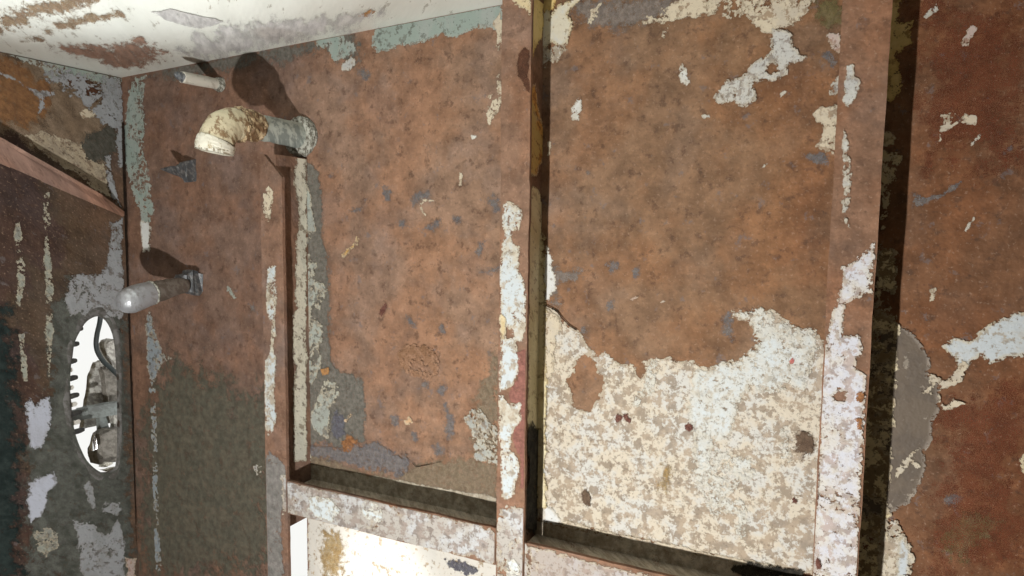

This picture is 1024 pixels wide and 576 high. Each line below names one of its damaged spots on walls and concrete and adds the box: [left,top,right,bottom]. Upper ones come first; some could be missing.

rust [20,8,173,70]
peeling [316,35,356,61]
peeling [371,0,579,68]
peeling [638,0,815,107]
rust [891,0,1024,190]
peeling [264,265,278,435]
peeling [279,83,1024,576]
peeling [23,396,52,449]
peeling [25,471,59,557]
rust [910,372,1024,576]